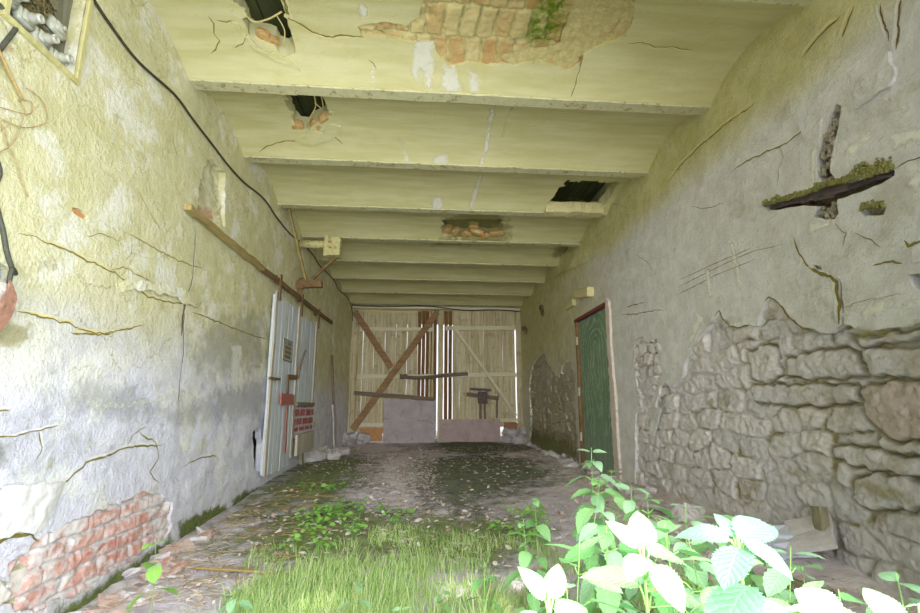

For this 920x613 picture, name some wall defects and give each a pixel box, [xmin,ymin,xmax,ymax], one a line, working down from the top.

spalling [359,0,639,69]
crack [876,0,901,49]
spalling [440,220,506,240]
crack [17,195,268,417]
crack [765,296,814,331]
crack [793,236,906,324]
crack [0,422,61,460]
crack [46,425,162,484]
spalling [527,351,579,462]
spalling [633,299,920,600]
crack [0,532,41,544]
spalling [0,491,170,613]